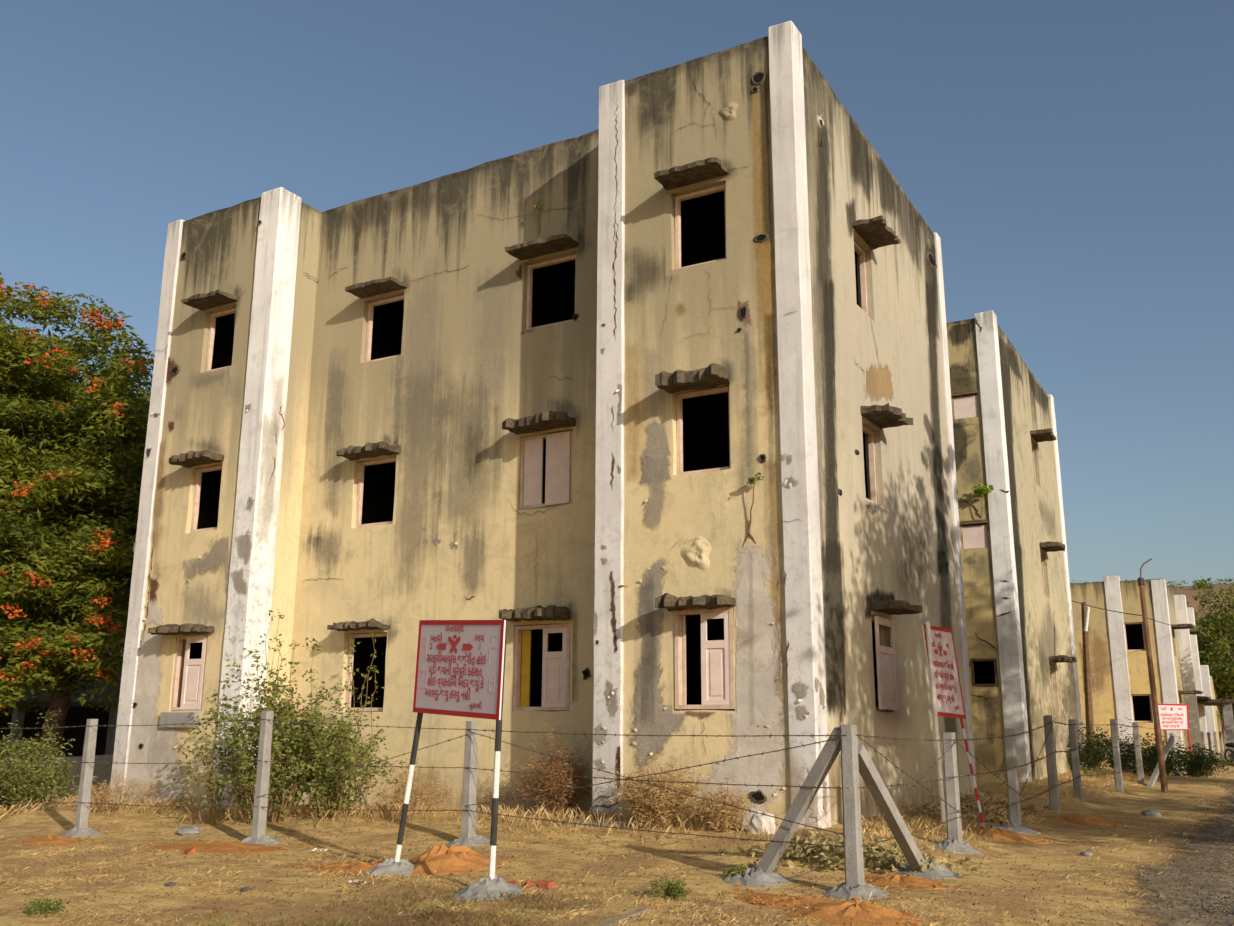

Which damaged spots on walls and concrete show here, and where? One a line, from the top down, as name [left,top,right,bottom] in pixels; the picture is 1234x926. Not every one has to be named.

crack [480,94,618,339]
damp [846,124,896,235]
crack [609,407,617,490]
peeling [640,421,671,528]
damp [807,93,846,713]
peeling [866,364,895,401]
damp [908,246,980,629]
peeling [183,531,252,622]
damp [316,534,338,573]
damp [465,538,484,600]
damp [866,589,895,618]
peeling [594,542,825,826]